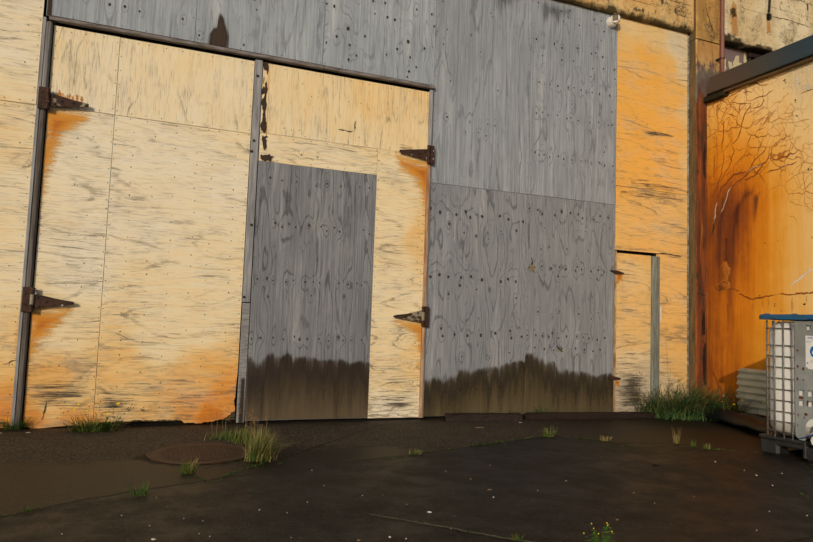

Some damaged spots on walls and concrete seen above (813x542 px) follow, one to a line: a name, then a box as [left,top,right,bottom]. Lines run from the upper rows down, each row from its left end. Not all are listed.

damp [209,14,229,47]
peeling [260,62,273,162]
corrosion [41,111,89,193]
corrosion [397,155,427,216]
crack [709,64,813,235]
corrosion [703,62,813,419]
crack [729,288,813,309]
corrosion [28,308,71,362]
damp [238,354,369,423]
damp [423,354,613,416]